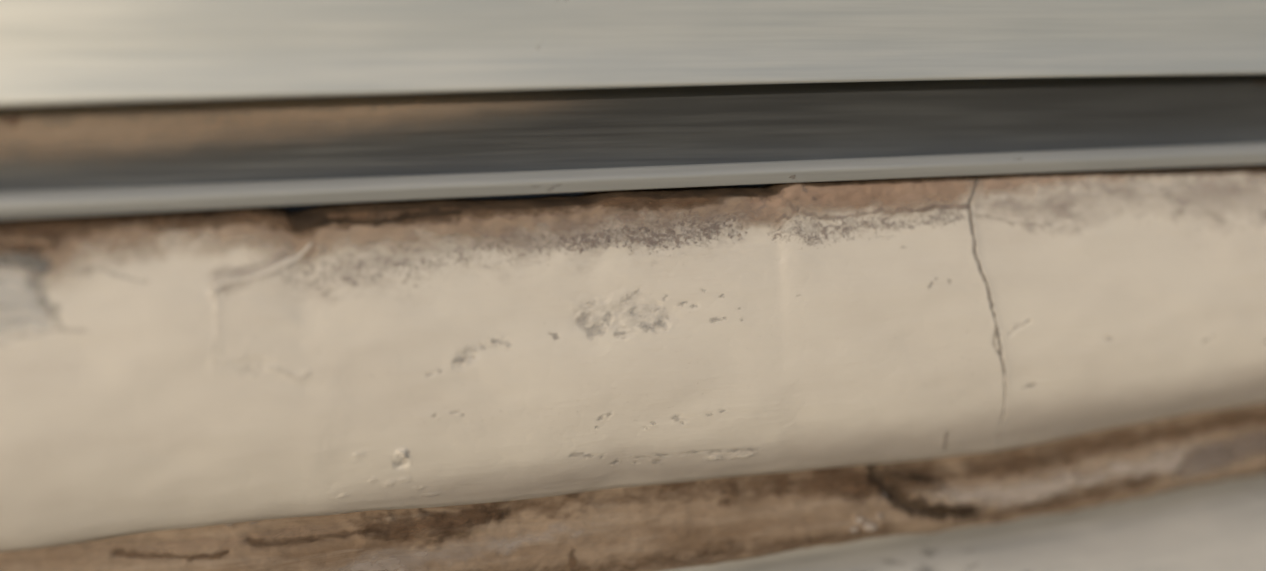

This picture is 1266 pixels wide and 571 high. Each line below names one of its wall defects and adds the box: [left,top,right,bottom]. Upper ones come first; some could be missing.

water stain [0,175,1084,274]
crack [967,179,1006,415]